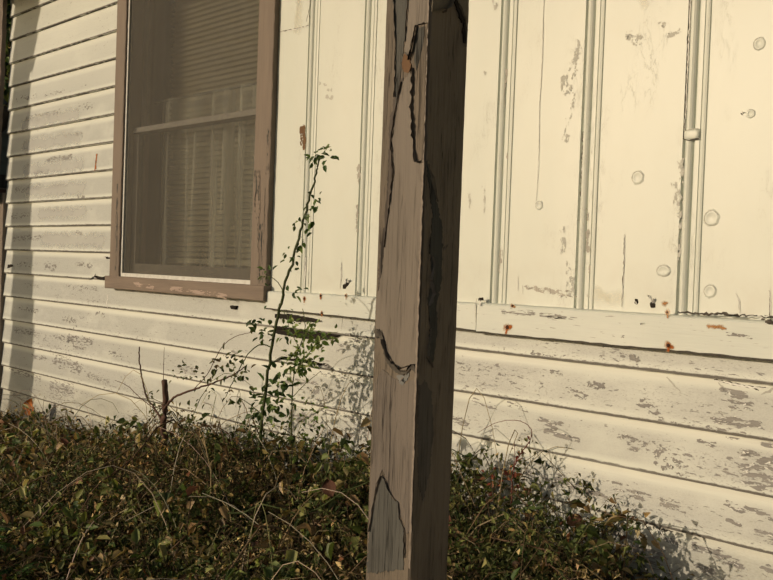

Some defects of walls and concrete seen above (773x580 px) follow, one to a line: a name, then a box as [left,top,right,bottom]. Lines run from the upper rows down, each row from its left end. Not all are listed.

peeling [433,0,467,48]
crack [537,31,545,128]
peeling [560,39,581,143]
peeling [378,0,448,368]
peeling [374,329,416,385]
peeling [417,381,434,501]
peeling [537,417,580,443]
peeling [617,434,687,478]
peeling [706,387,773,494]
peeling [366,475,405,574]
peeling [610,529,747,577]
peeling [723,500,773,527]